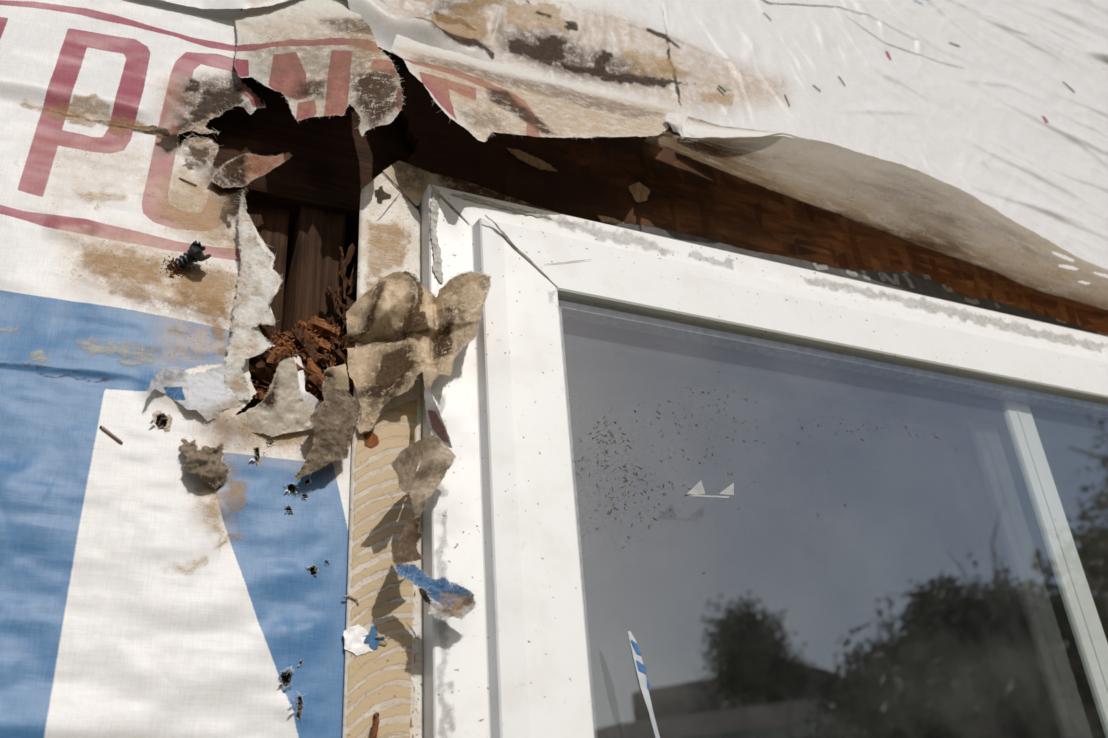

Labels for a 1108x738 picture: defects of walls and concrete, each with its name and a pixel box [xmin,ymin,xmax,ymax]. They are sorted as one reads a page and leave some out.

water stain [415,0,687,103]